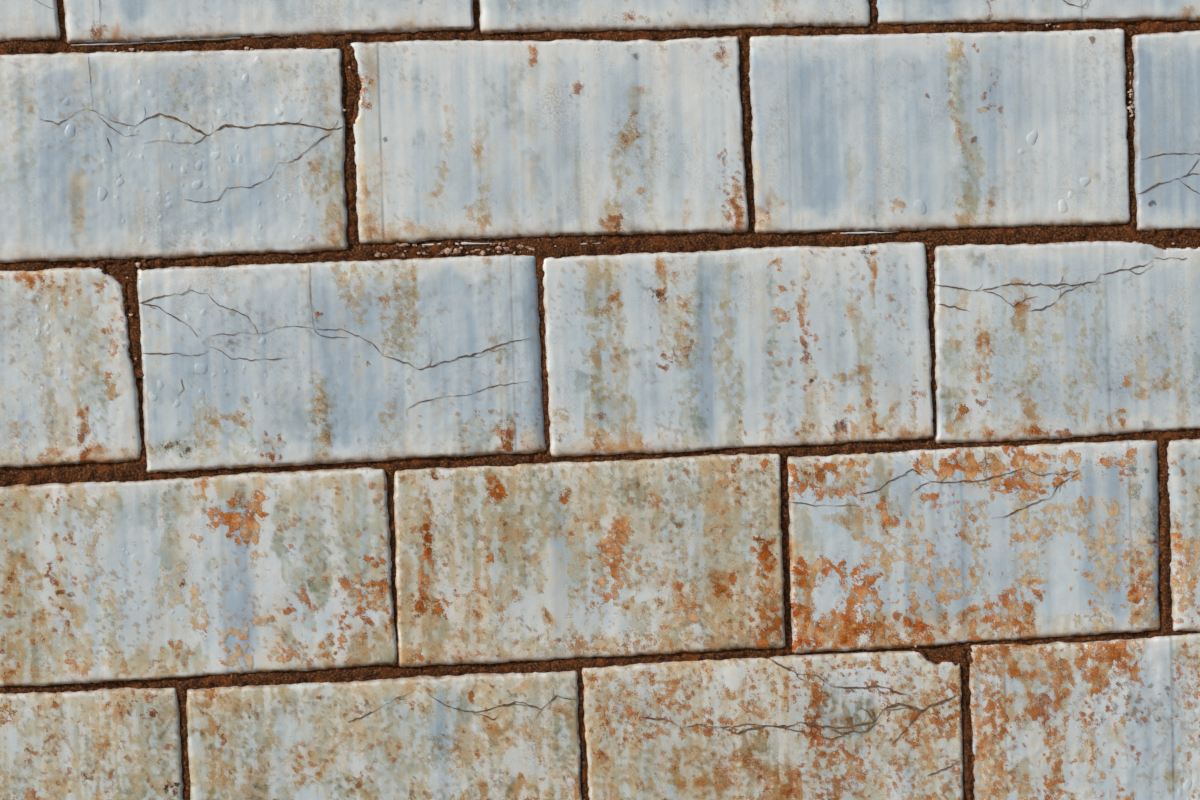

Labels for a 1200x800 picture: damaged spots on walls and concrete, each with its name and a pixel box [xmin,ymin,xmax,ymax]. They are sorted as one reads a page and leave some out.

crack [41,56,344,203]
crack [1139,153,1200,194]
crack [935,257,1187,311]
crack [140,286,529,396]
rust [774,304,812,364]
rust [101,372,119,401]
rust [77,414,91,462]
rust [795,398,883,443]
crack [792,453,1080,518]
rust [0,494,136,679]
rust [142,407,1200,800]
crack [642,658,959,744]